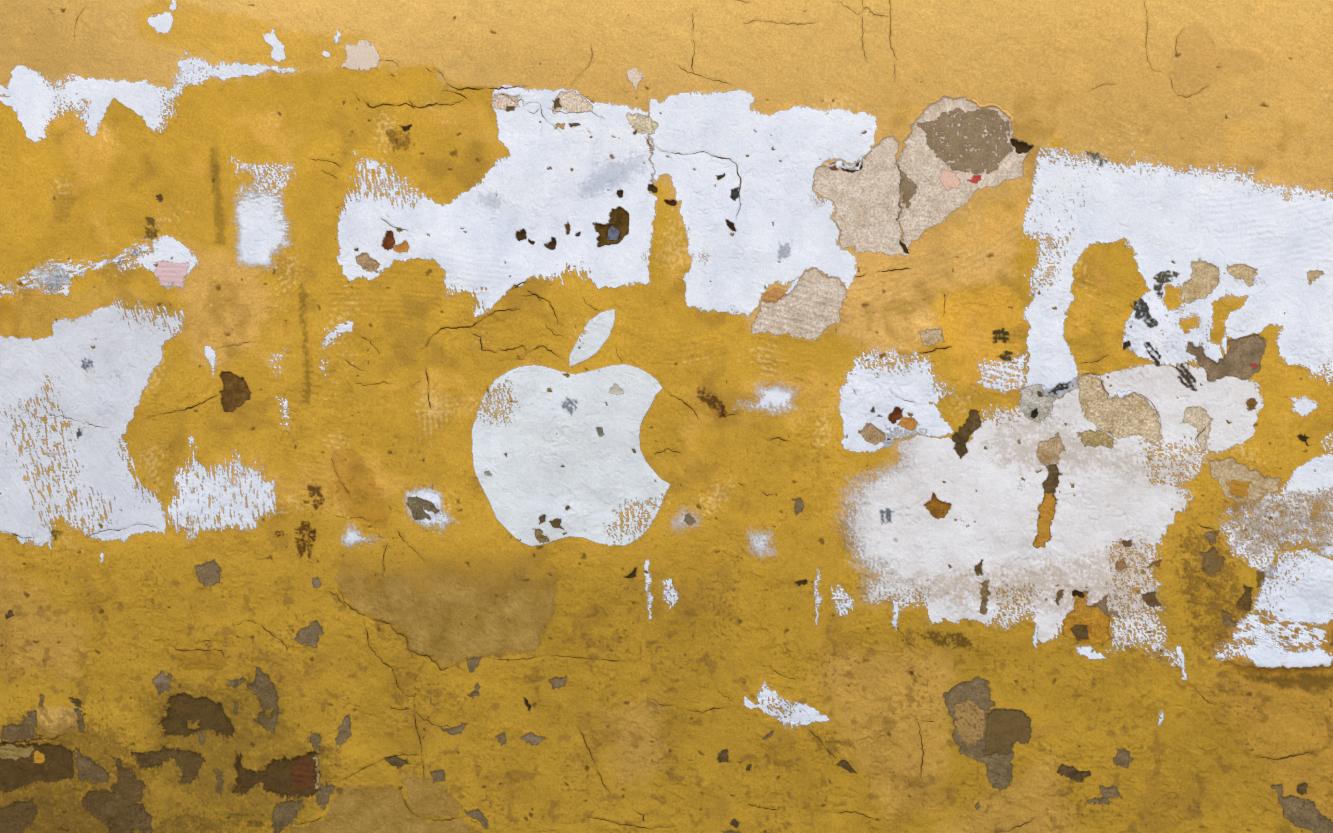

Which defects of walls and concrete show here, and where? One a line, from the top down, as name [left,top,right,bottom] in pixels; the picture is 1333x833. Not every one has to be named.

flaking render [813,96,1033,256]
flaking render [354,231,409,273]
flaking render [516,190,629,250]
flaking render [752,268,847,340]
flaking render [1186,334,1266,382]
peeling [860,407,918,445]
flaking render [952,410,982,459]
flaking render [1077,373,1163,449]
flaking render [1033,433,1065,548]
flaking render [1055,590,1119,645]
flaking render [0,667,351,833]
flaking render [943,676,1031,790]